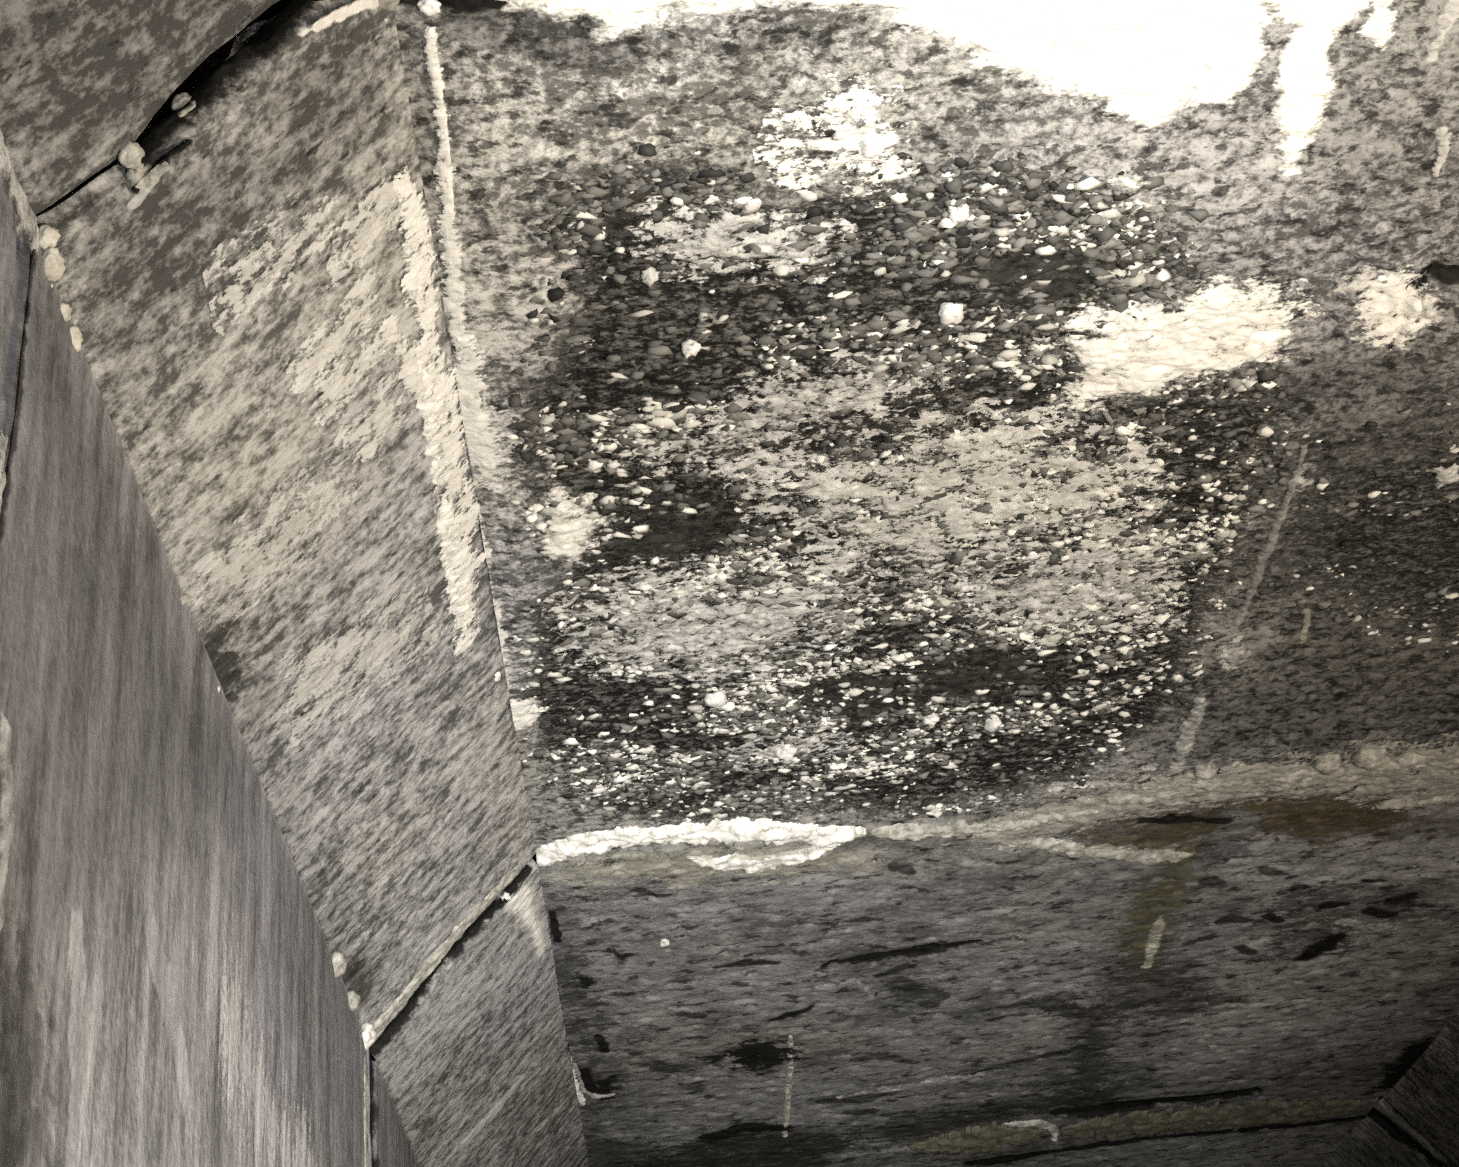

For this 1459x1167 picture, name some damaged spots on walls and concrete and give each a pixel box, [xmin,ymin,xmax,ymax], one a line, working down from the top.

crack [128,0,508,210]
leakage [753,72,921,198]
leakage [501,0,1397,176]
leakage [1108,175,1148,189]
leakage [1292,464,1313,492]
leakage [1218,633,1251,669]
leakage [1169,697,1206,774]
leakage [584,823,1247,1167]